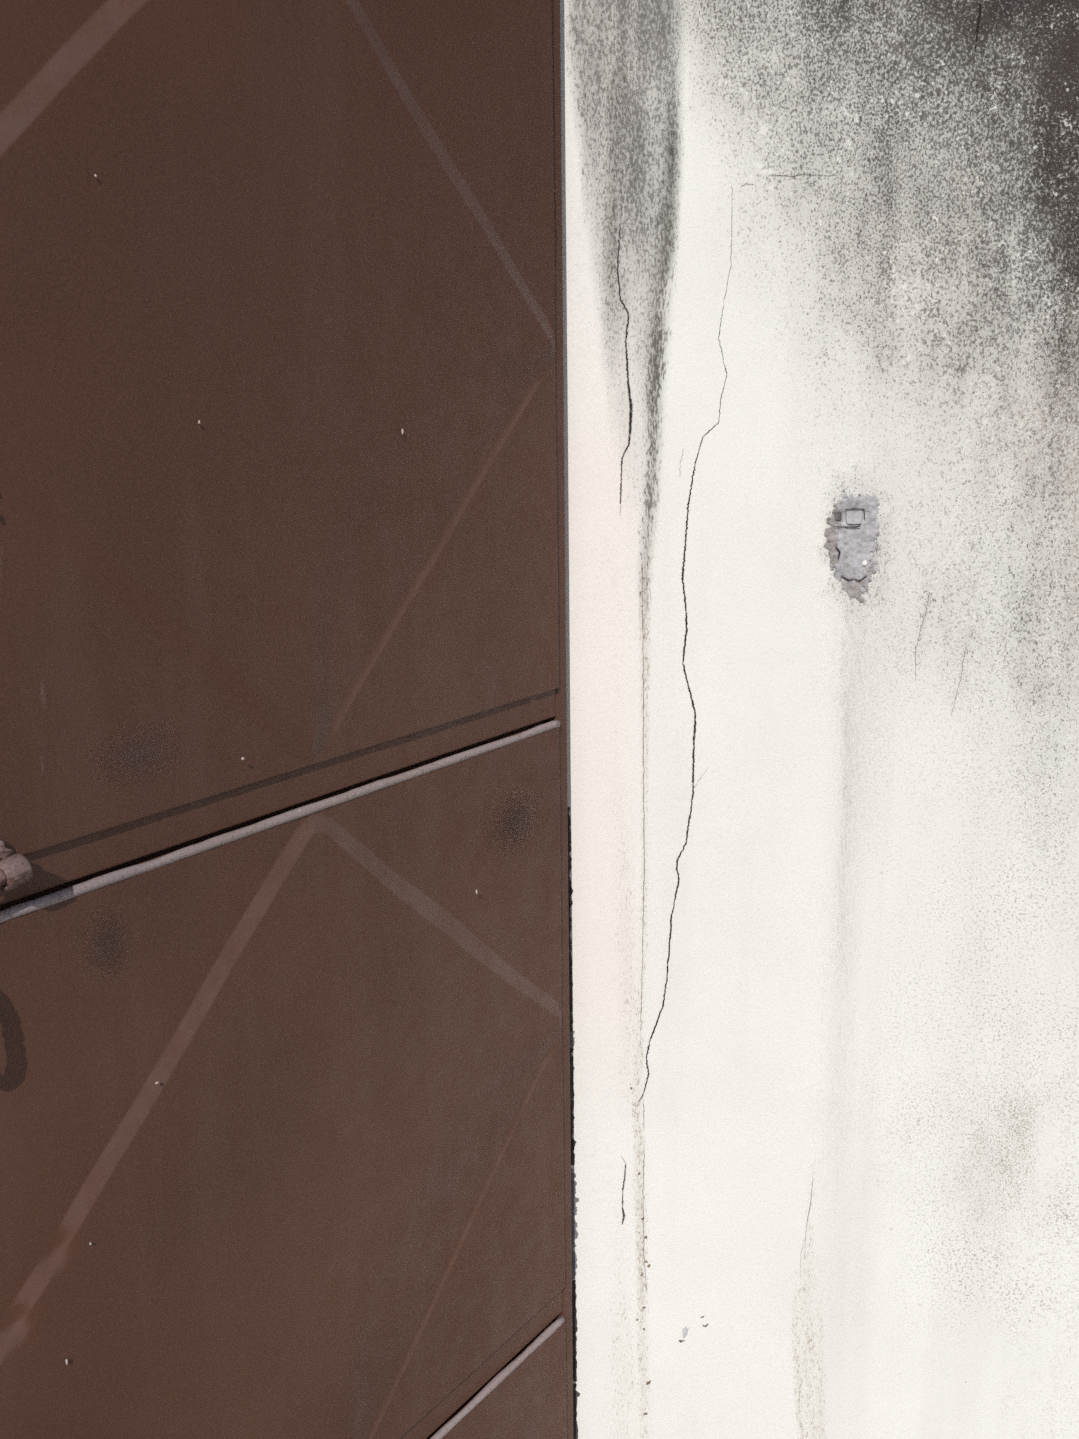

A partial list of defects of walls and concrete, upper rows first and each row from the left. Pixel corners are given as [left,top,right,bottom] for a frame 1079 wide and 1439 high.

crack [616,180,633,511]
crack [621,174,833,1289]
damp [570,0,1079,660]
flaking render [823,482,888,605]